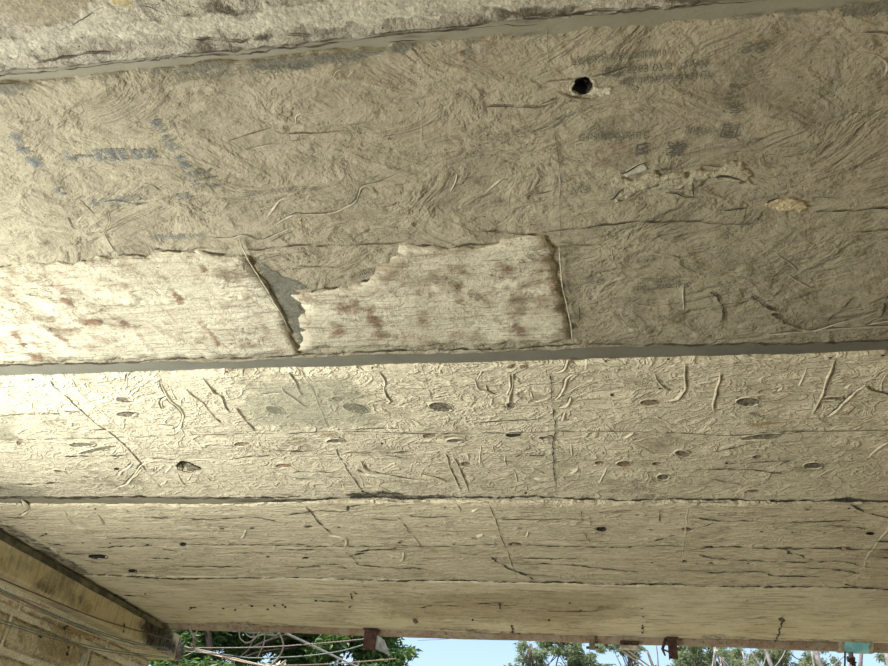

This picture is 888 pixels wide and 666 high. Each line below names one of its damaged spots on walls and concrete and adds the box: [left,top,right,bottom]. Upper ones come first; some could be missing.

leakage [0,0,584,58]
spalling [611,160,753,203]
spalling [765,197,809,213]
peeling [0,235,574,363]
crack [0,288,888,634]